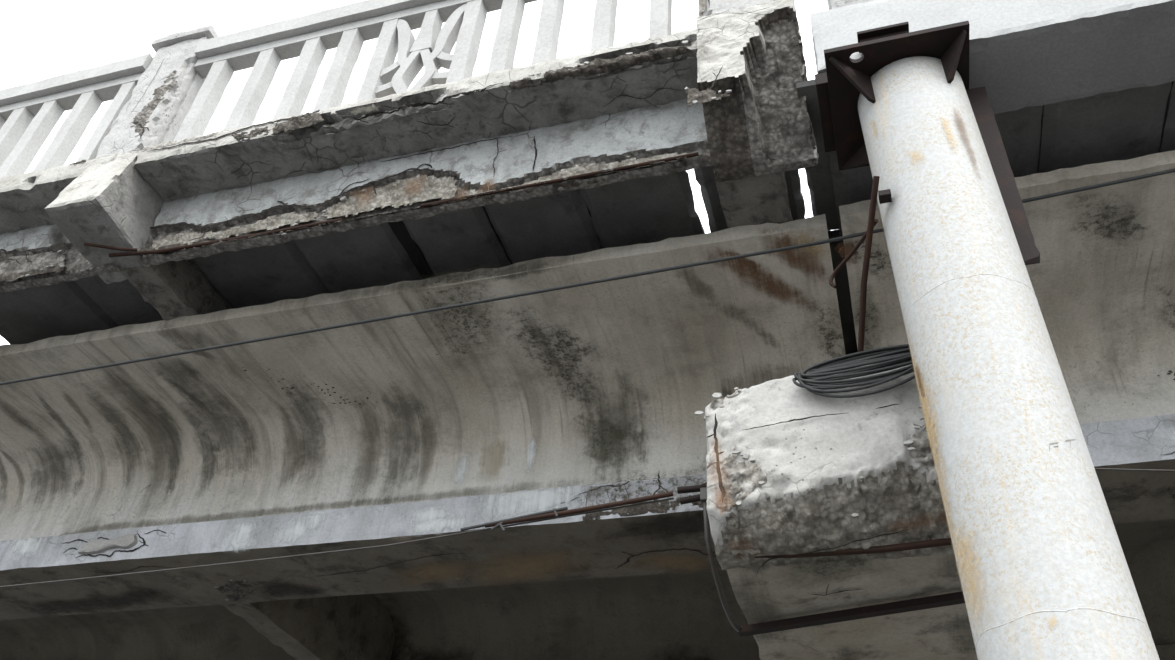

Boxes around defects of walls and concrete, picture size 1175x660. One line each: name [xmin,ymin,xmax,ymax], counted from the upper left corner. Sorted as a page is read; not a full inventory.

spalling [130,70,324,152]
crack [128,61,537,242]
crack [605,66,723,107]
spalling [0,250,66,282]
spalling [84,152,699,257]
corrosion [720,252,799,302]
corrosion [776,237,824,275]
leakage [1079,196,1139,239]
leakage [165,364,238,481]
leakage [515,311,631,498]
spalling [716,402,953,562]
crack [614,548,716,569]